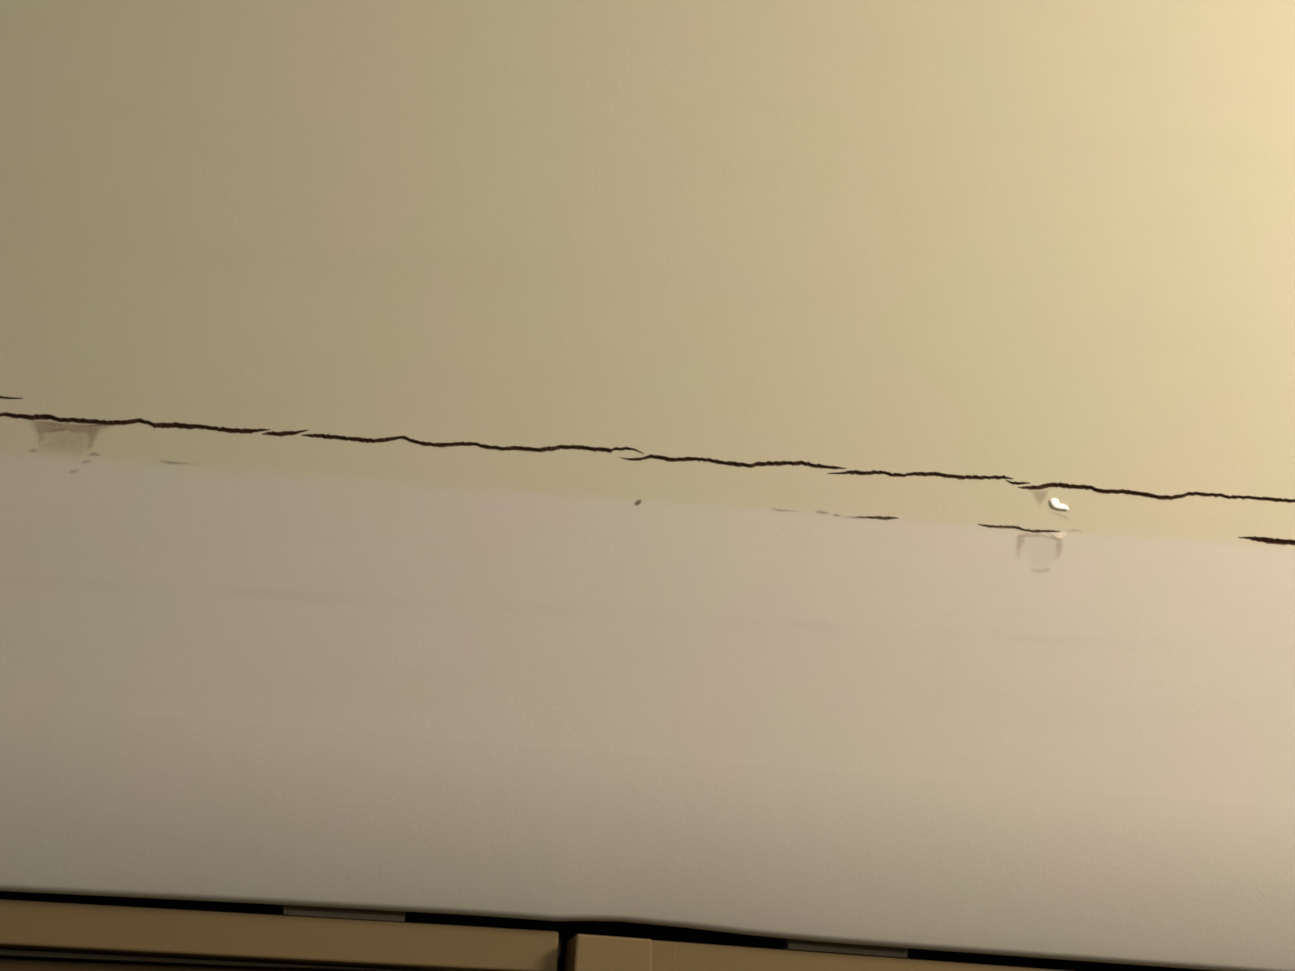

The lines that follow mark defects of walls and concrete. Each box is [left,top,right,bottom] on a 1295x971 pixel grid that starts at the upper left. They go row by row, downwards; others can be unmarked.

water stain [43,422,99,431]
crack [0,396,1295,503]
crack [857,514,897,522]
crack [978,524,1061,533]
crack [1238,536,1295,545]